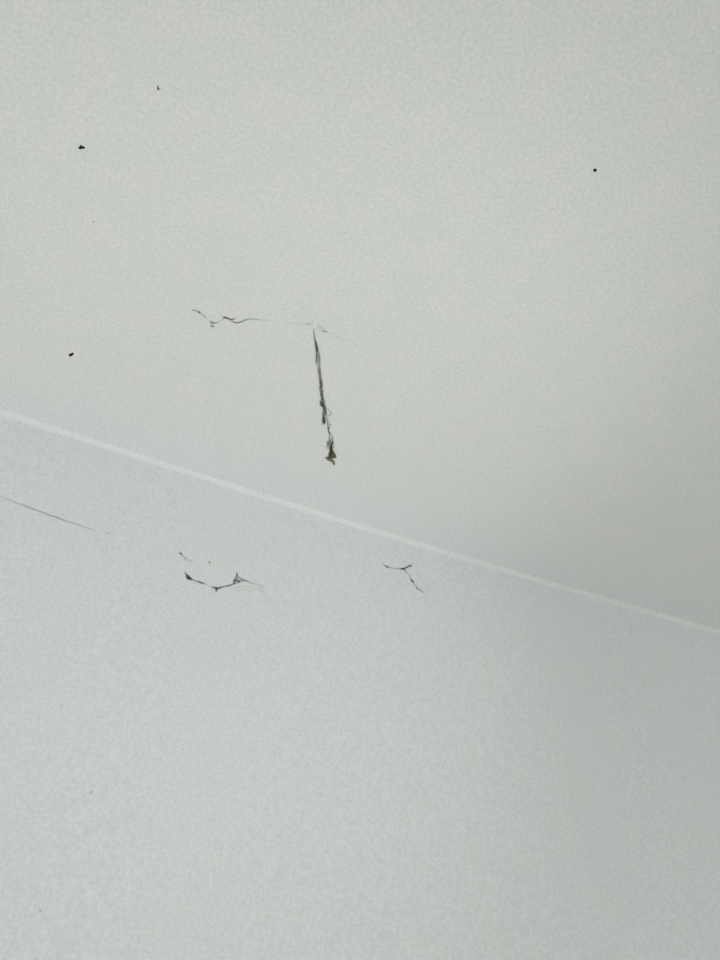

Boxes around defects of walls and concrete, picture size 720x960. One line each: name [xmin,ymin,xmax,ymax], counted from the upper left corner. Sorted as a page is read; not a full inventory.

crack [314,339,336,465]